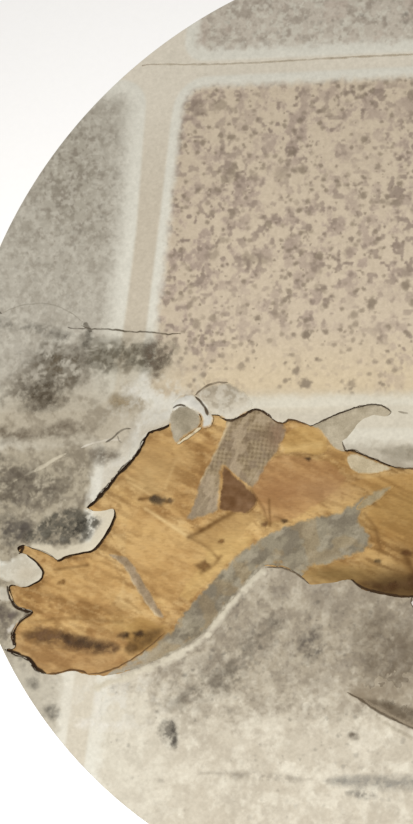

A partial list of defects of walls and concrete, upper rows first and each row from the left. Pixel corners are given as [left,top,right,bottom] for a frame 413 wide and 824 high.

crack [68,323,181,335]
leakage [31,353,79,408]
peeling [282,425,328,456]
peeling [346,453,392,475]
leakage [3,468,56,507]
peeling [0,368,252,603]
leakage [3,523,30,539]